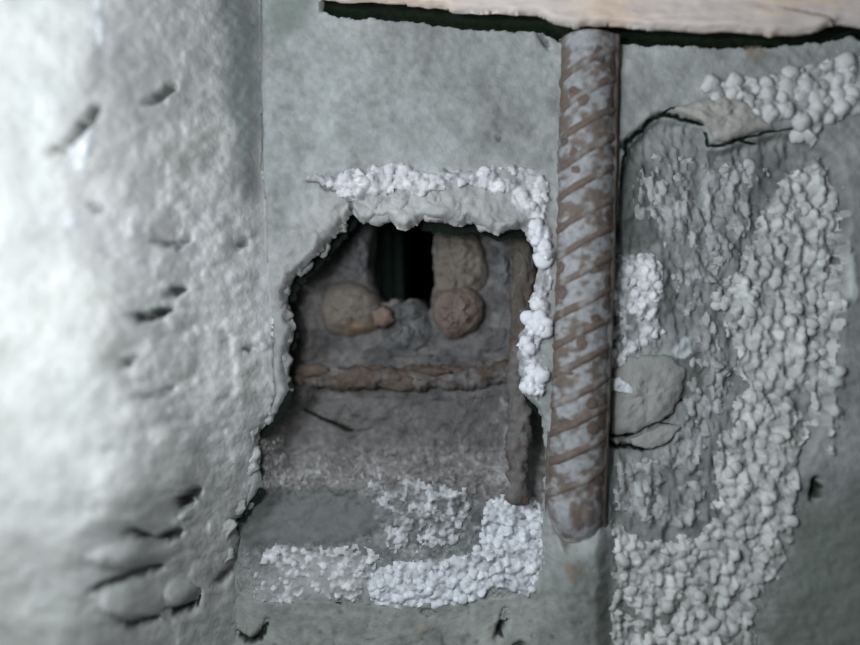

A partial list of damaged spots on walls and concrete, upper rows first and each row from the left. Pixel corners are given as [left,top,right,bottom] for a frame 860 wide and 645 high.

rust [568,86,588,106]
rust [561,138,580,173]
crack [619,107,792,209]
spalling [339,189,410,234]
leakage [306,161,556,401]
rust [590,267,611,322]
spalling [282,338,294,382]
leakage [607,51,860,645]
spalling [247,406,278,476]
crack [609,433,645,451]
spalling [219,499,247,579]
leakage [245,437,545,610]